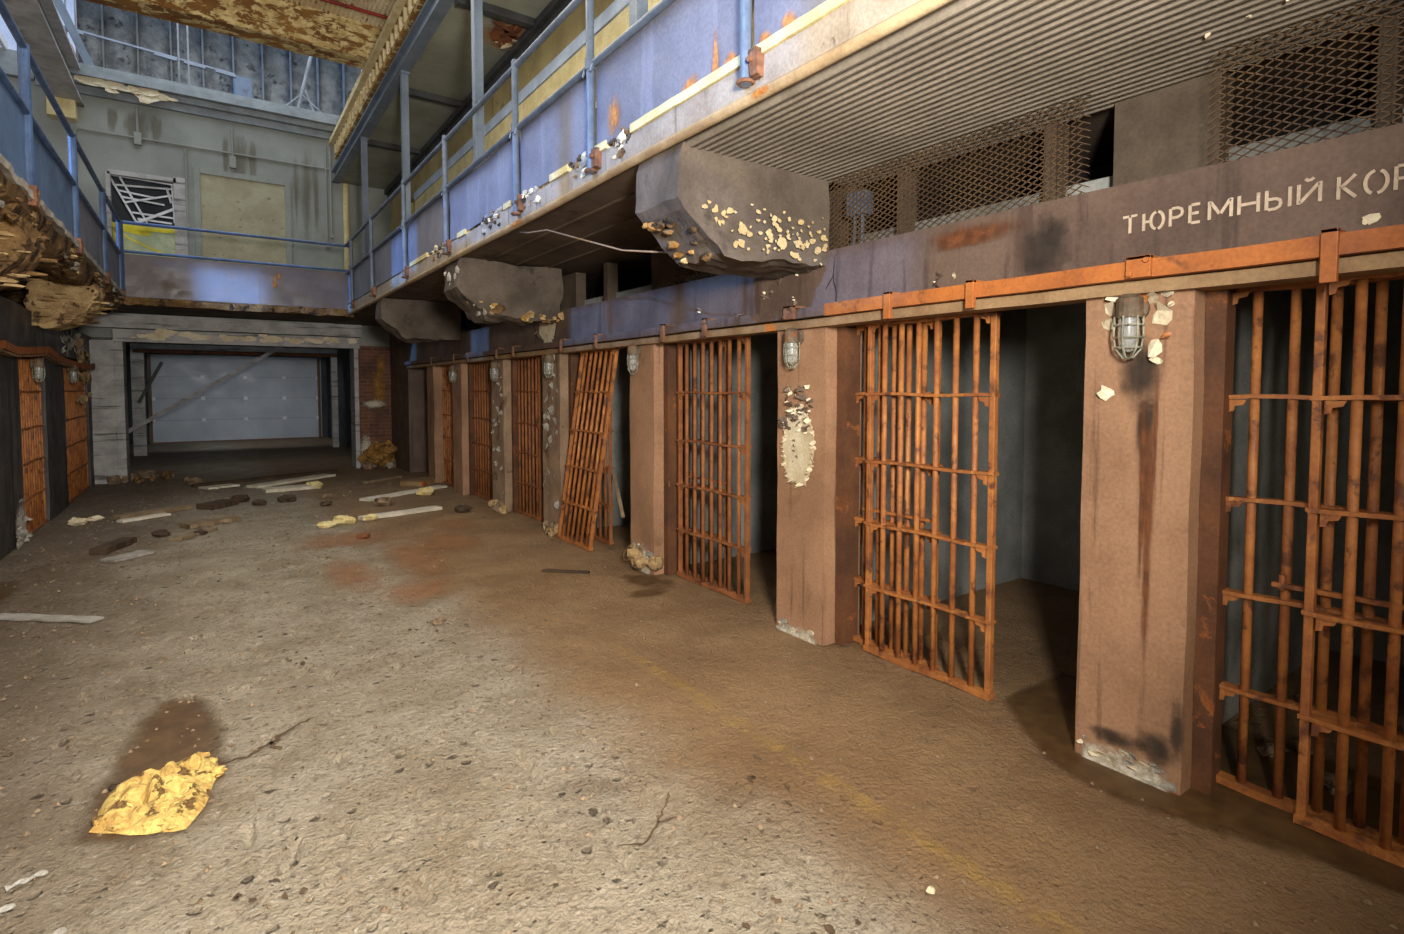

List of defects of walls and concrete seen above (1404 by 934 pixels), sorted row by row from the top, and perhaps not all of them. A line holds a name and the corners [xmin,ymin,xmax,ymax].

spalling [568,151,587,178]
spalling [609,127,632,159]
spalling [432,241,460,286]
spalling [521,186,541,213]
spalling [642,217,711,264]
peeling [702,200,828,266]
peeling [1362,213,1381,225]
peeling [521,310,564,449]
peeling [777,385,816,488]
rust [1139,399,1158,641]
damp [83,699,223,841]
damp [1008,674,1404,892]